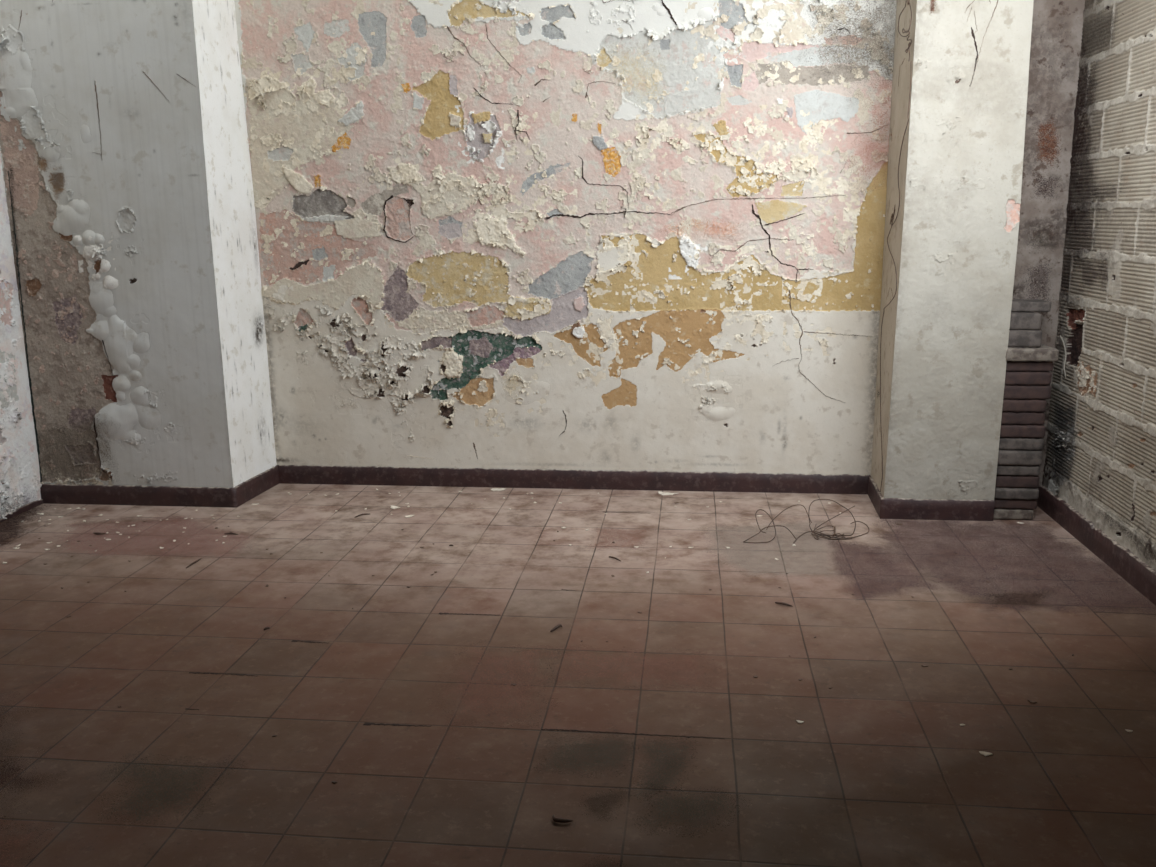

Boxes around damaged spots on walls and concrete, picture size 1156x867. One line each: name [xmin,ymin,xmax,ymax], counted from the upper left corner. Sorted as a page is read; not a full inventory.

peeling [0,9,136,519]
peeling [238,0,896,427]
crack [546,157,872,402]
leakage [1019,0,1126,307]
leakage [1049,396,1078,490]